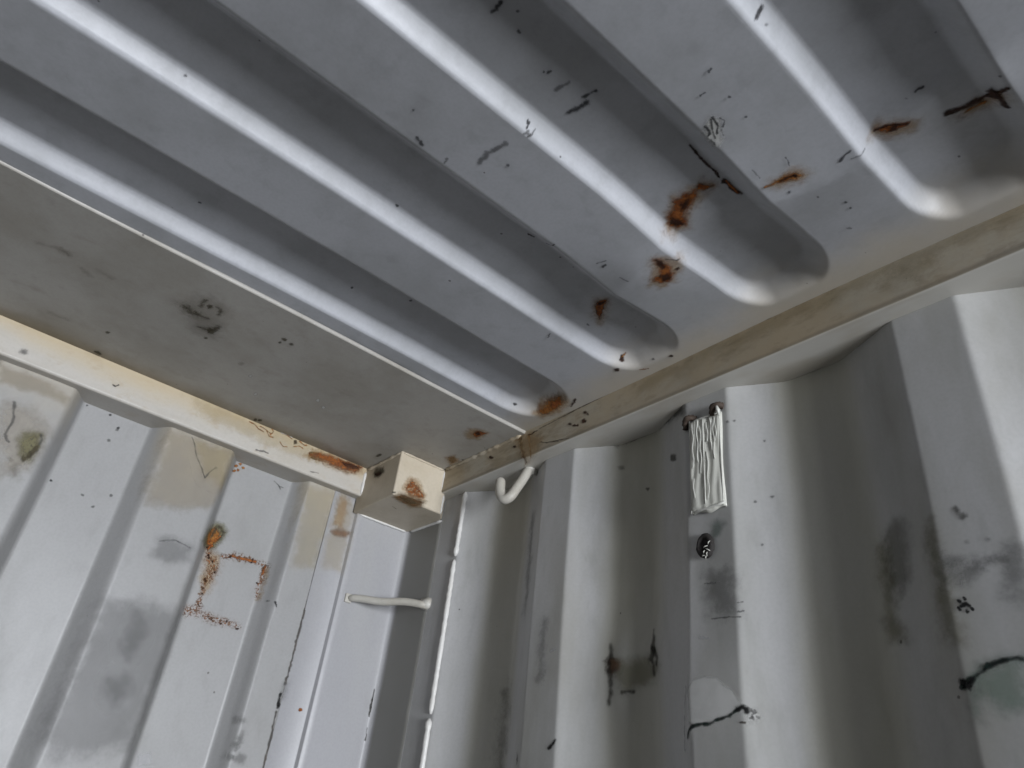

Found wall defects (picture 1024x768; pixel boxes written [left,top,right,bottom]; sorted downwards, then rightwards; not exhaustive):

corrosion [944,87,1010,116]
corrosion [874,122,910,132]
corrosion [668,145,743,228]
corrosion [764,173,804,188]
corrosion [654,259,680,283]
corrosion [595,300,606,318]
corrosion [513,394,608,463]
corrosion [309,453,362,474]
corrosion [396,481,424,506]
corrosion [183,543,267,630]
crack [959,656,1024,690]
crack [687,705,749,739]